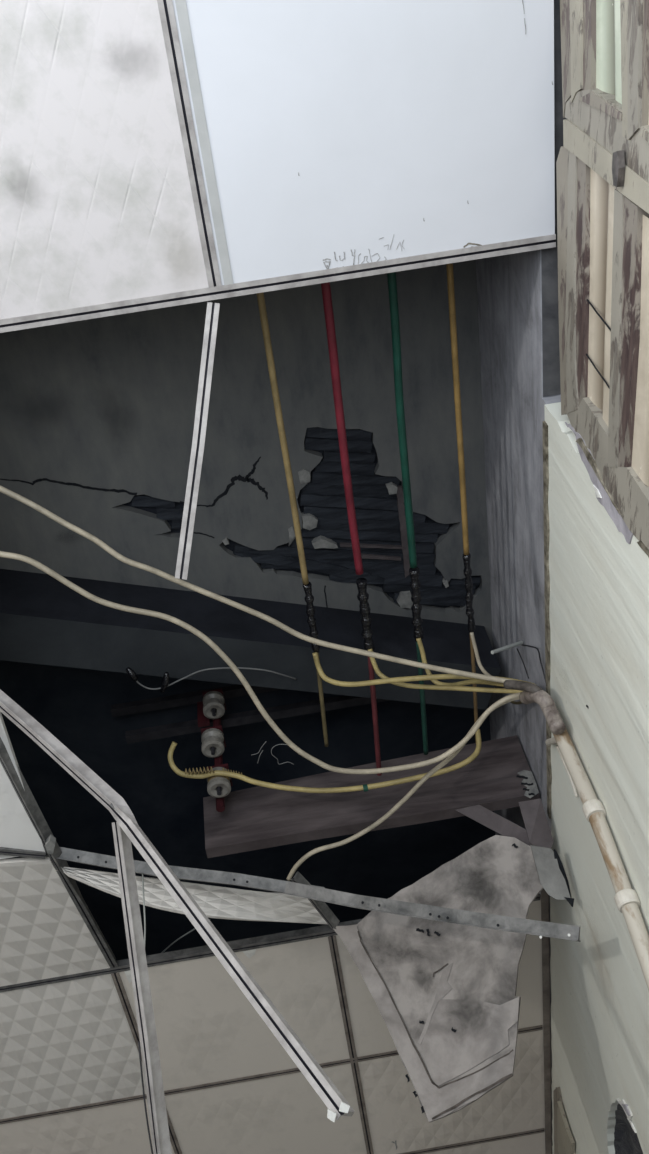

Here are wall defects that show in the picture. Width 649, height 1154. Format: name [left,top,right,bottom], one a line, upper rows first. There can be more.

crack [0,478,137,495]
crack [180,457,268,538]
flaking render [222,427,481,609]
flaking render [616,1099,637,1133]